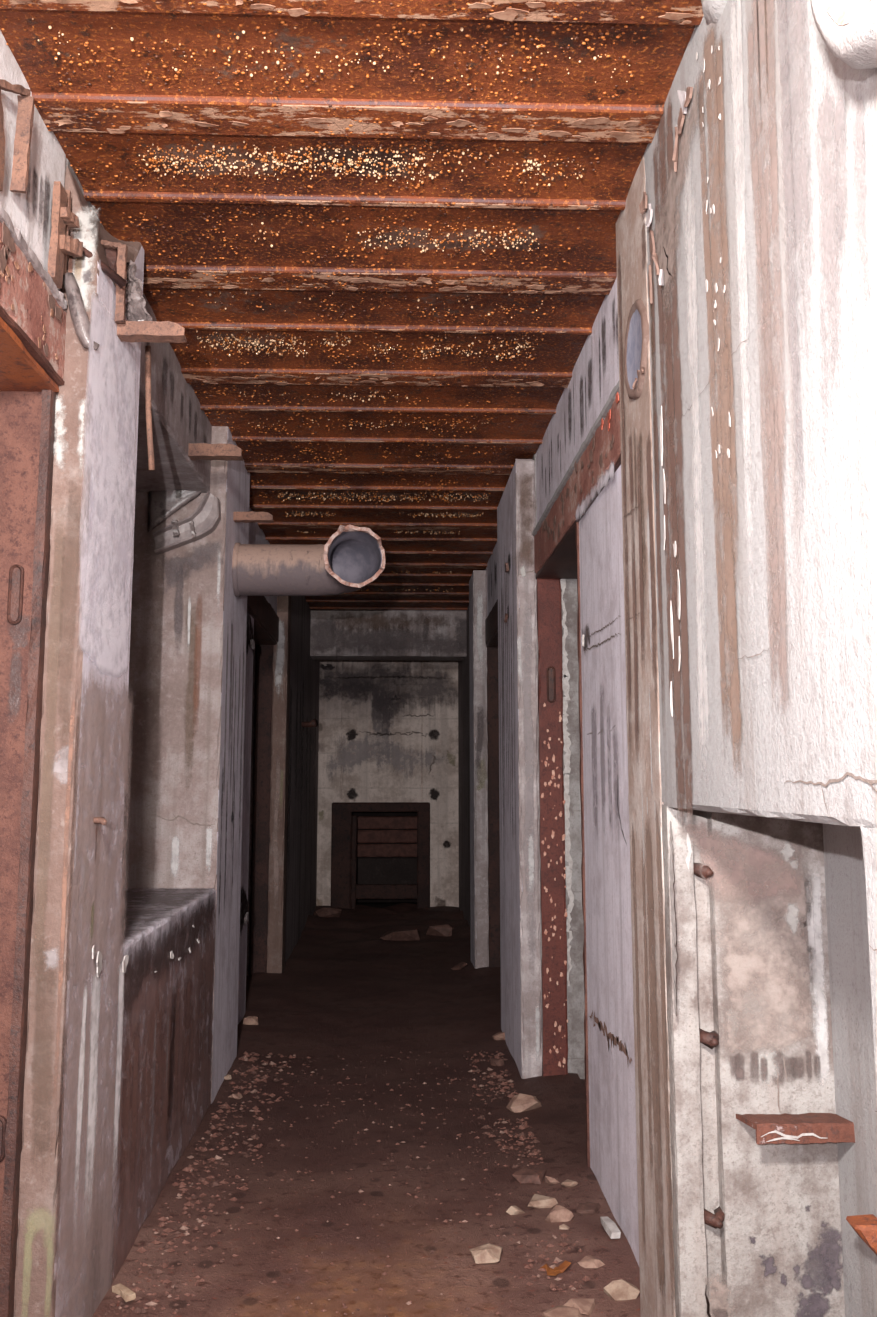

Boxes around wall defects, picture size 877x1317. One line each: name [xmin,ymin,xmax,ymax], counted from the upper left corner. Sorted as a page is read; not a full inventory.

peeling [236,0,310,17]
peeling [468,0,546,21]
peeling [54,120,131,134]
peeling [391,116,472,135]
rust [63,247,126,288]
leakage [477,0,866,986]
crack [784,772,877,811]
peeling [669,821,813,1053]
leakage [731,880,829,1082]
leakage [632,798,674,1299]
leakage [761,1130,823,1142]
leakage [750,1221,843,1317]